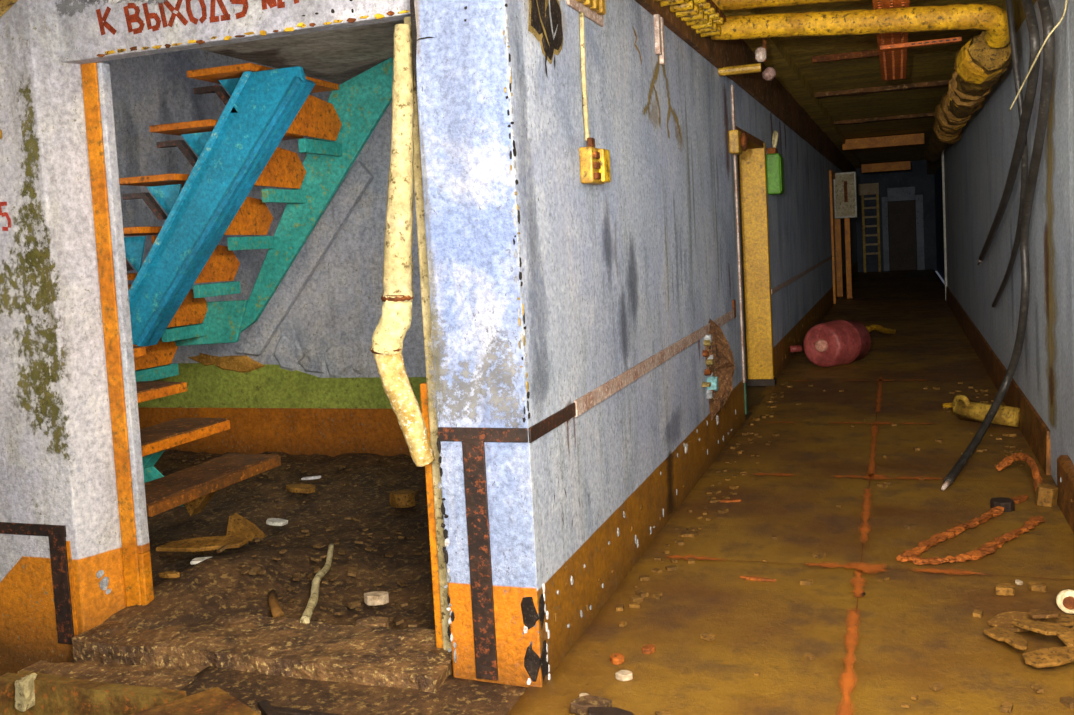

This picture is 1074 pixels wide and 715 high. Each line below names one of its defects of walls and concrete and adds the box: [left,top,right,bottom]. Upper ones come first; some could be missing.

damp [0,79,70,460]